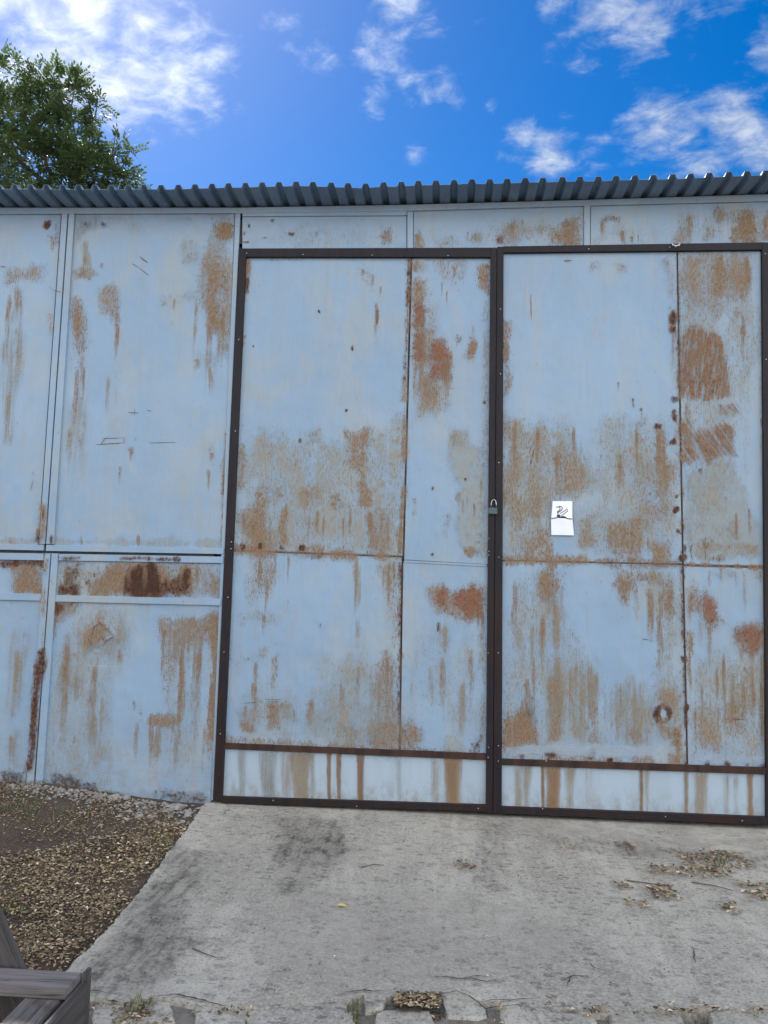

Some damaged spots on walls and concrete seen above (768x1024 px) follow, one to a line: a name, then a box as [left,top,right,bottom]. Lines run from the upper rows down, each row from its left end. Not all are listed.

rust [5,265,40,320]
rust [69,299,87,424]
rust [183,219,250,386]
rust [402,258,489,417]
rust [496,217,582,246]
rust [664,206,768,472]
rust [0,556,220,771]
rust [133,611,315,758]
rust [234,486,487,803]
rust [503,545,764,813]